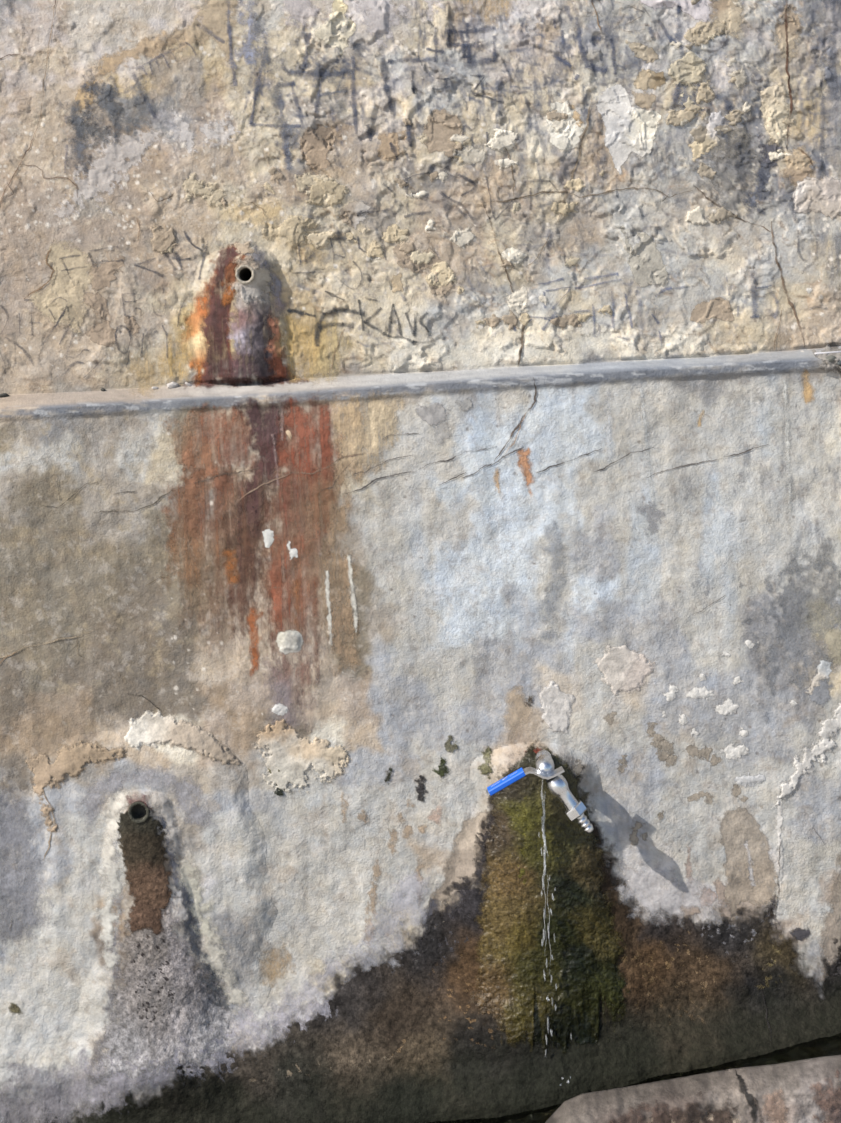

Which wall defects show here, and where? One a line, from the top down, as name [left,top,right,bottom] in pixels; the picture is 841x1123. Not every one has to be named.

crack [0,0,78,203]
peeling [596,0,841,226]
crack [785,3,813,165]
corrosion [130,245,351,392]
peeling [475,286,549,330]
peeling [550,305,613,330]
crack [47,325,537,514]
crack [539,445,766,478]
corrosion [165,397,403,727]
peeling [26,710,241,832]
peeling [253,703,350,795]
water stain [0,703,841,1123]